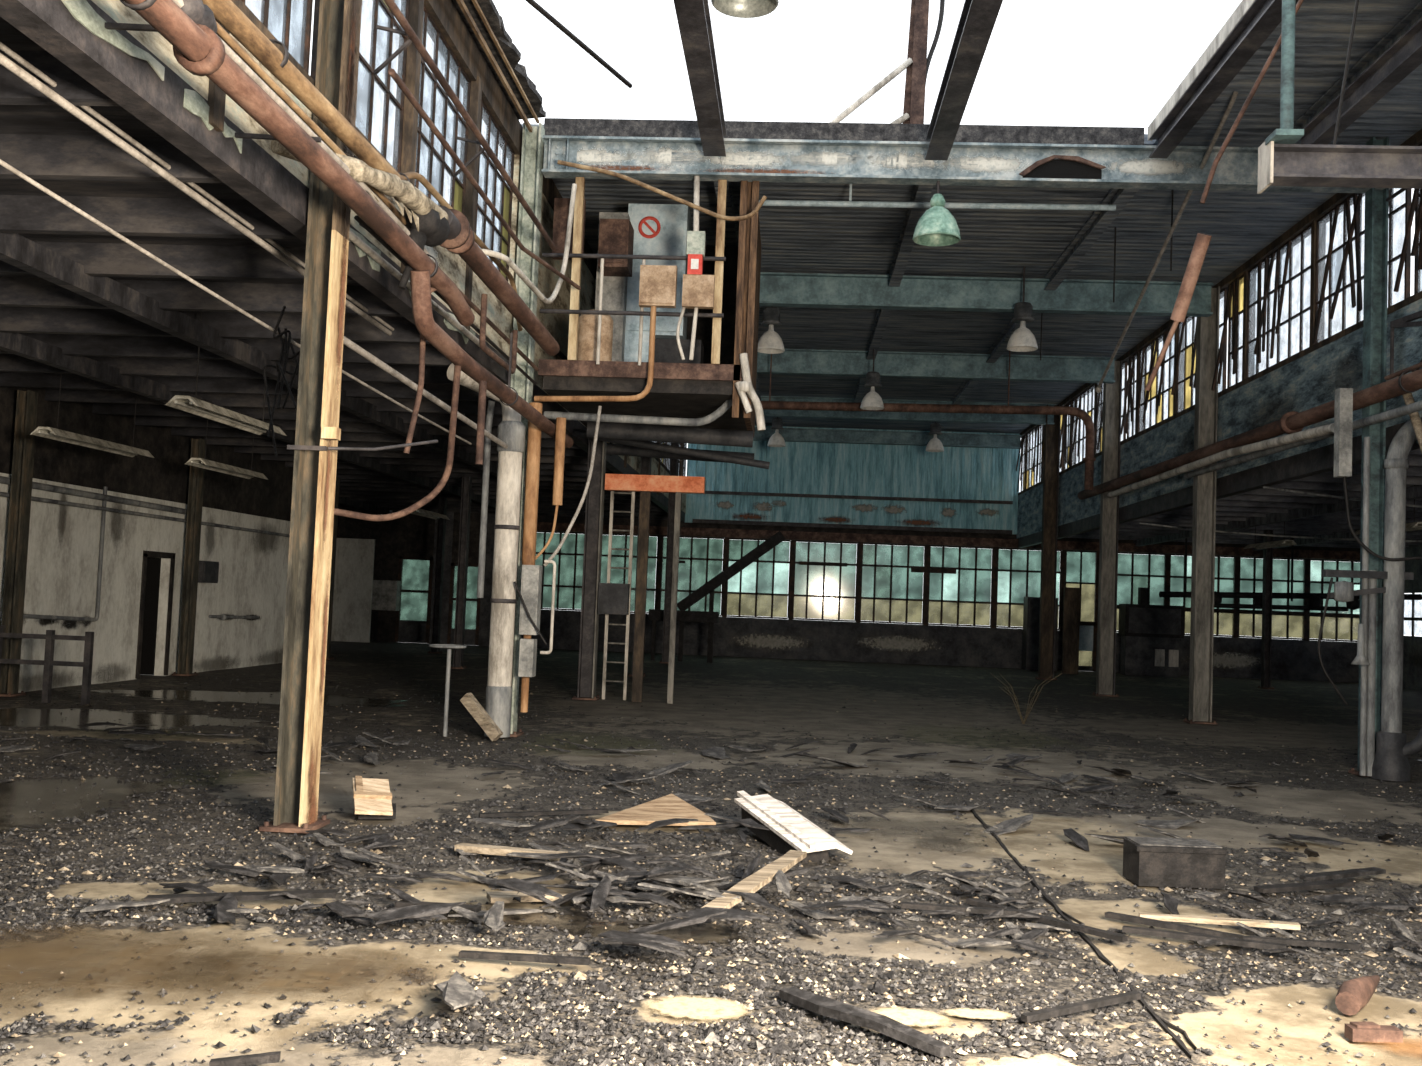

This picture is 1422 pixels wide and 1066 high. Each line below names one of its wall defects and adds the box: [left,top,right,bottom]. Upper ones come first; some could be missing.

peeling [61,0,165,81]
rust [347,15,356,122]
peeling [369,190,437,262]
rust [337,239,347,365]